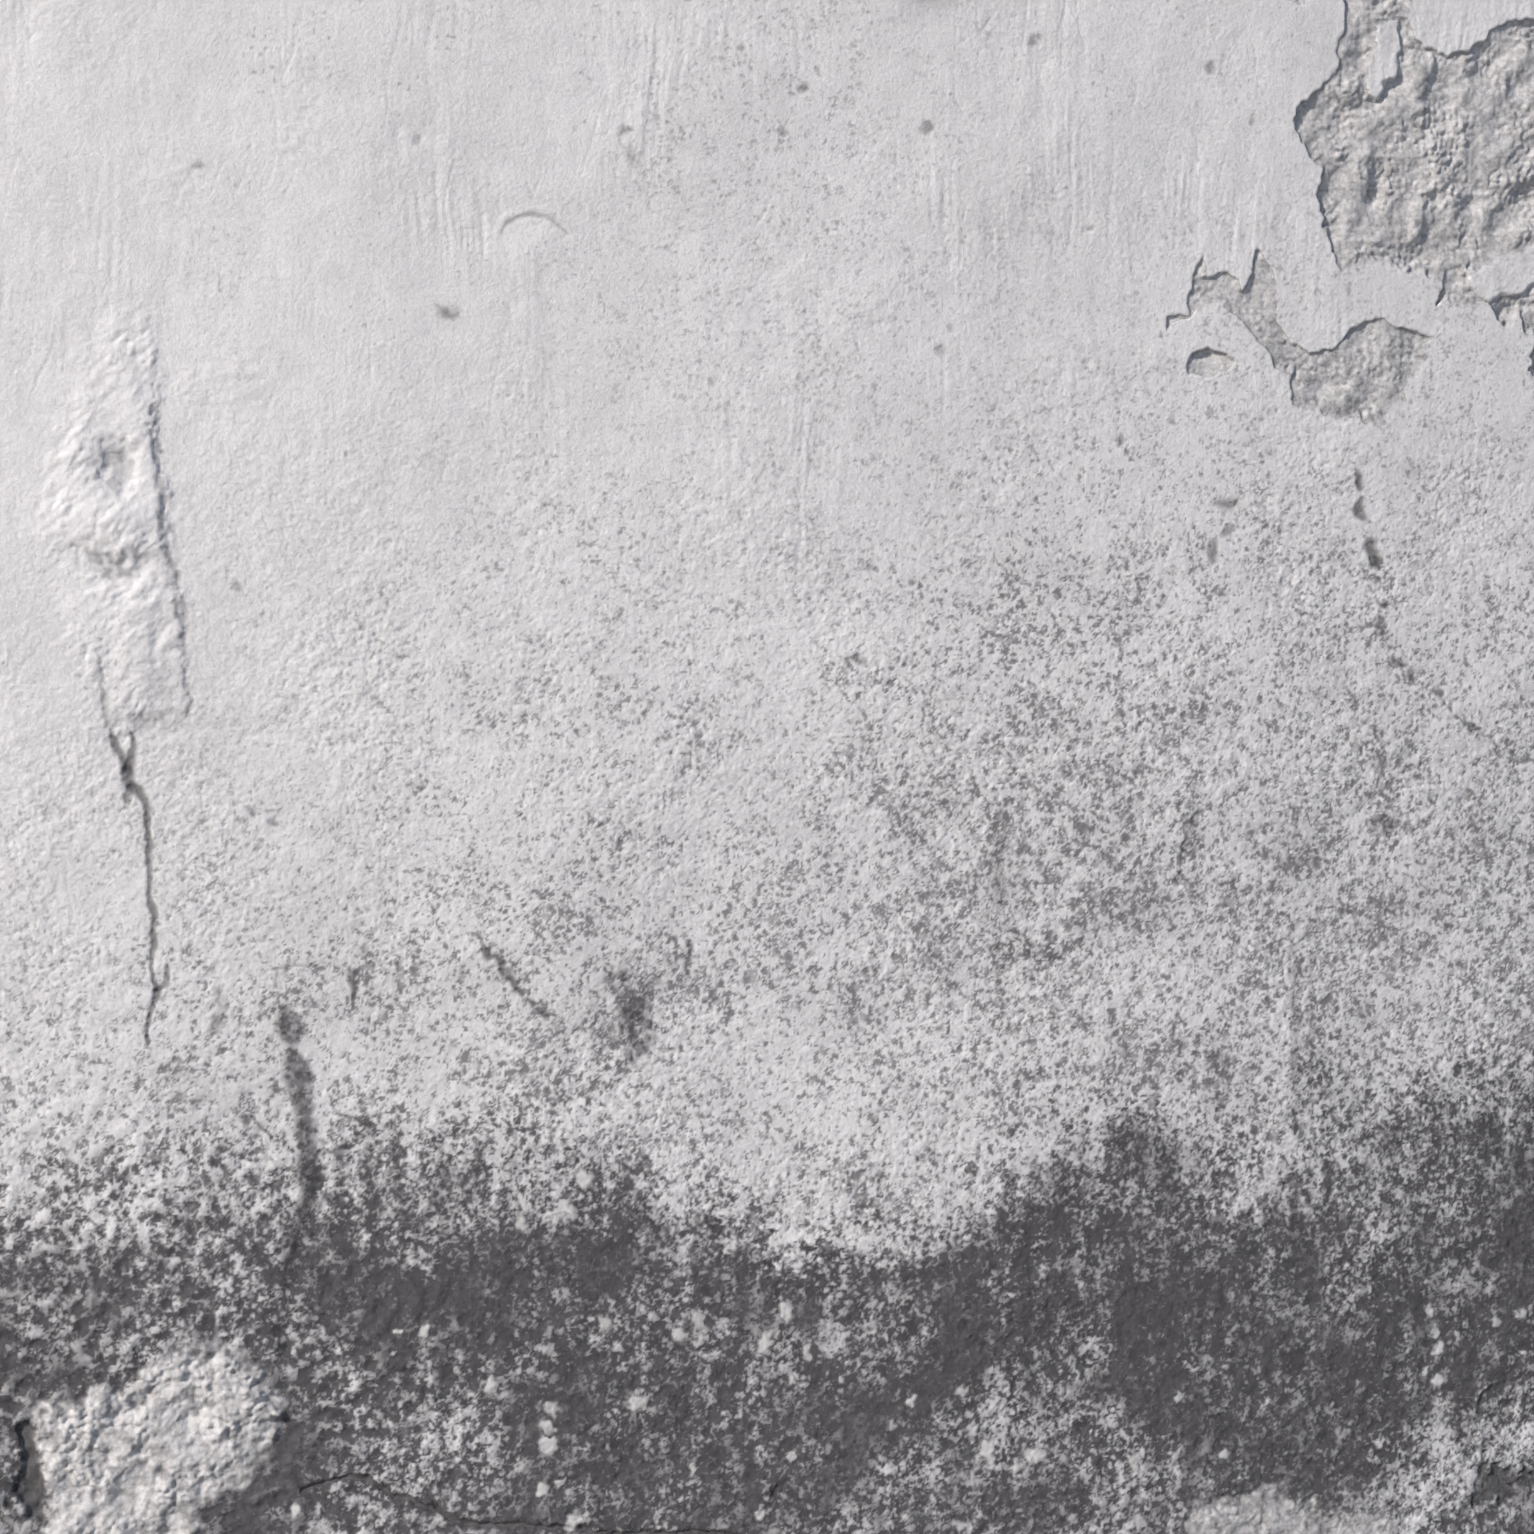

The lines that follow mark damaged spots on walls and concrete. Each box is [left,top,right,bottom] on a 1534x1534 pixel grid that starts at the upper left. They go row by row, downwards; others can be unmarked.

spalling [1167,250,1432,424]
spalling [1294,0,1534,376]
water stain [0,1007,1534,1534]
crack [301,1473,734,1534]